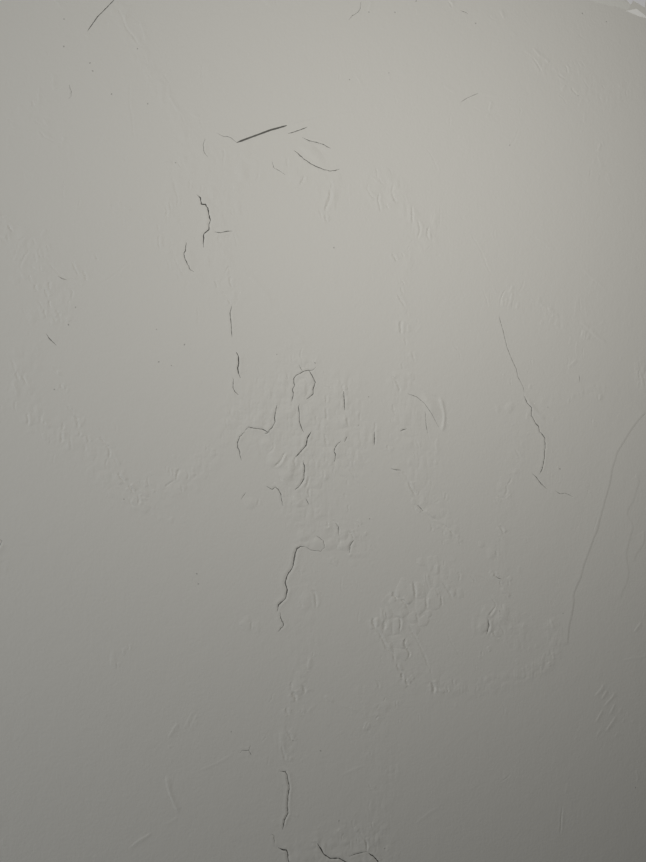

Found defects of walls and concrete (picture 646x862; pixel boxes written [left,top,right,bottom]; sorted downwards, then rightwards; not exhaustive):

crack [83,0,124,34]
crack [177,188,218,275]
crack [520,391,551,477]
crack [272,540,310,616]
crack [271,765,386,862]